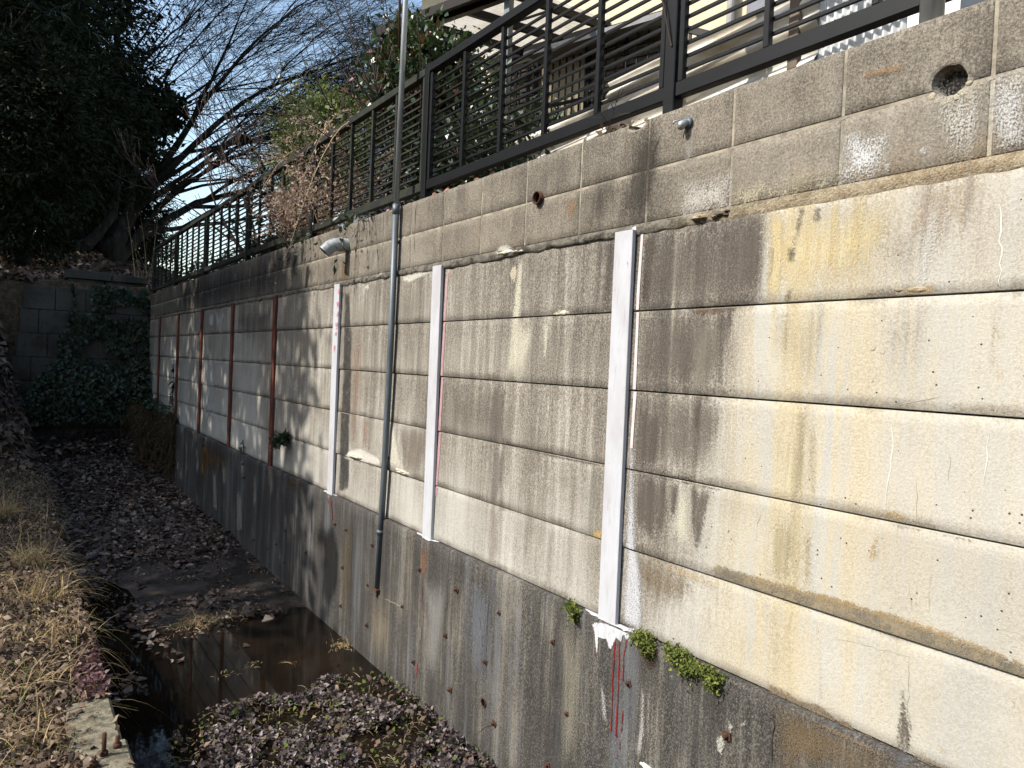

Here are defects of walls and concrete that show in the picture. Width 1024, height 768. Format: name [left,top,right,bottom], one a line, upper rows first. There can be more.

hole [928,80,973,105]
crack [996,197,1004,285]
crack [885,397,937,498]
leakage [657,472,716,546]
leakage [322,526,338,603]
leakage [415,585,443,677]
leakage [640,563,1023,675]